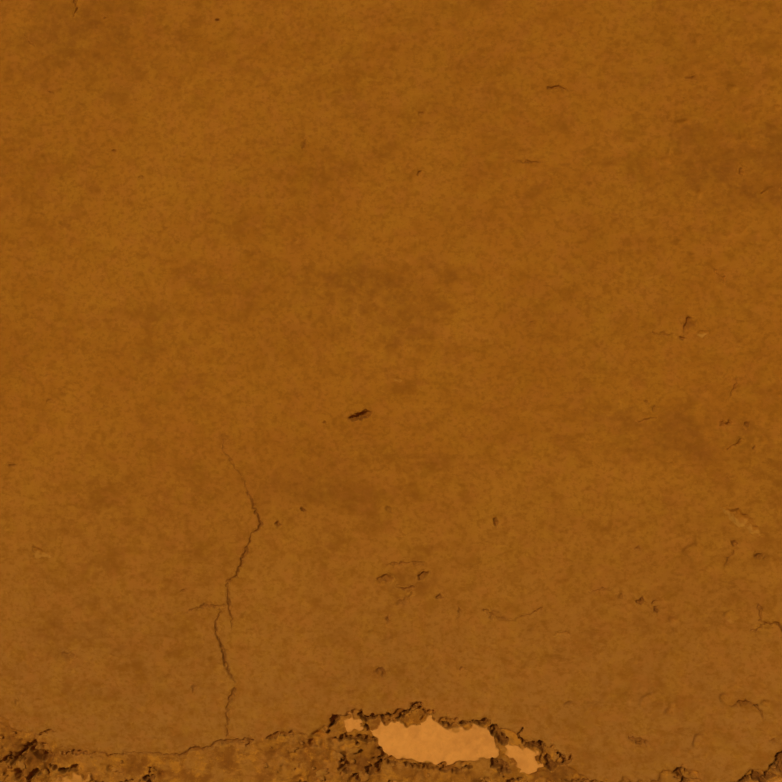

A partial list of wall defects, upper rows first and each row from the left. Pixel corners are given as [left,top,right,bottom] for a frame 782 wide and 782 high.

crack [89,433,264,758]
crack [746,602,782,638]
spalling [0,698,653,782]
spalling [660,763,701,782]
spalling [733,750,782,782]